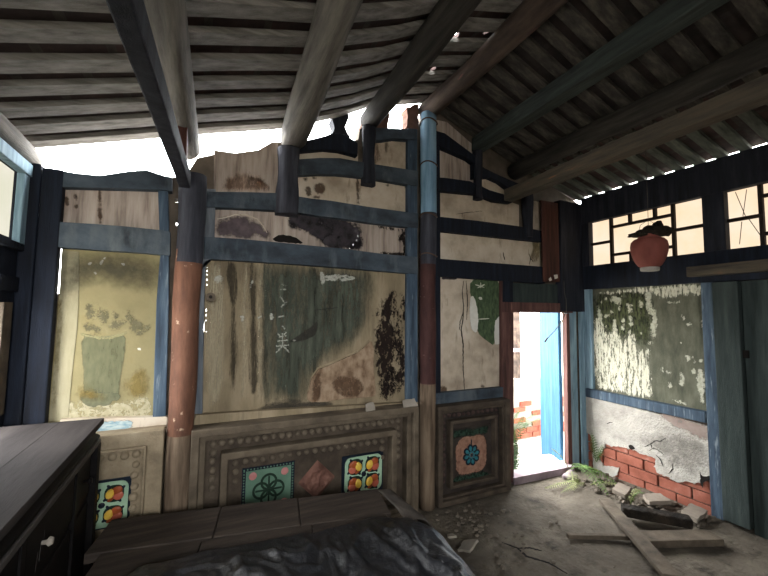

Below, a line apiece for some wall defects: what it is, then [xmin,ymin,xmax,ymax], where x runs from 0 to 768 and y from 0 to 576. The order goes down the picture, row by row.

water stain [206,261,269,402]
water stain [374,290,405,400]
crack [459,281,468,389]
water stain [593,290,653,345]
peeling [593,284,701,398]
peeling [662,355,706,404]
spalling [586,397,711,516]
crack [644,438,673,473]